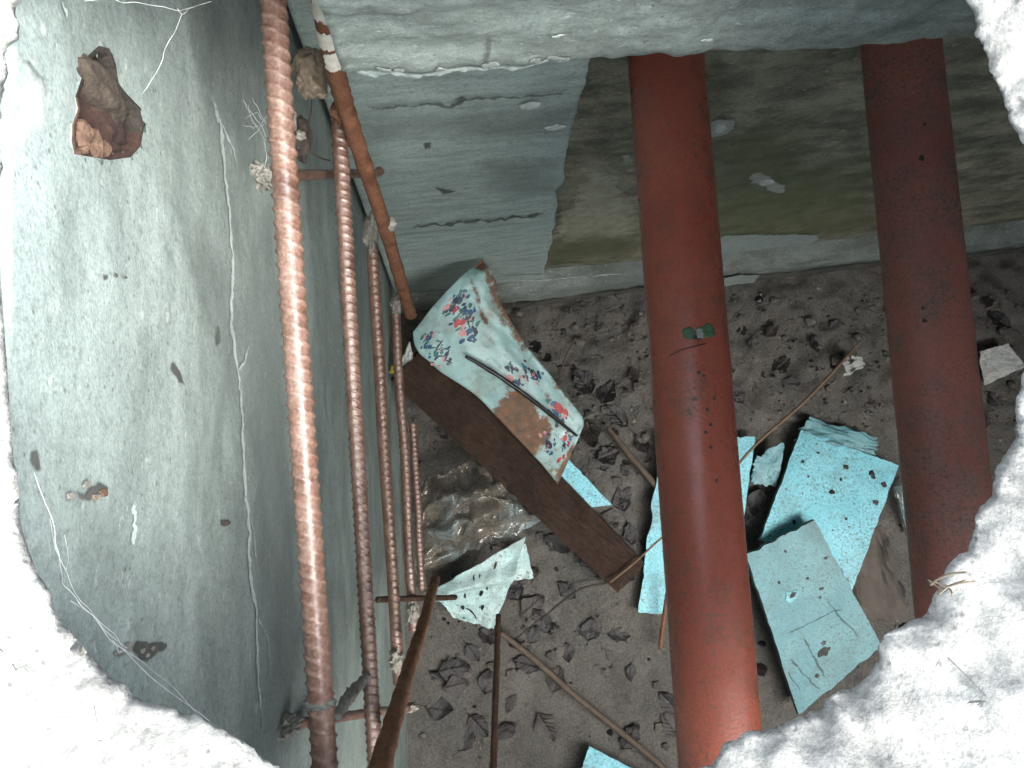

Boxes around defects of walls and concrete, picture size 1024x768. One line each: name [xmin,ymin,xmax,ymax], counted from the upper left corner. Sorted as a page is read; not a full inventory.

spalling [69,43,145,165]
crack [373,93,561,110]
water stain [552,158,639,246]
crack [417,213,542,228]
water stain [756,262,881,280]
crack [208,92,271,722]
spalling [67,480,108,501]
spalling [114,641,167,661]